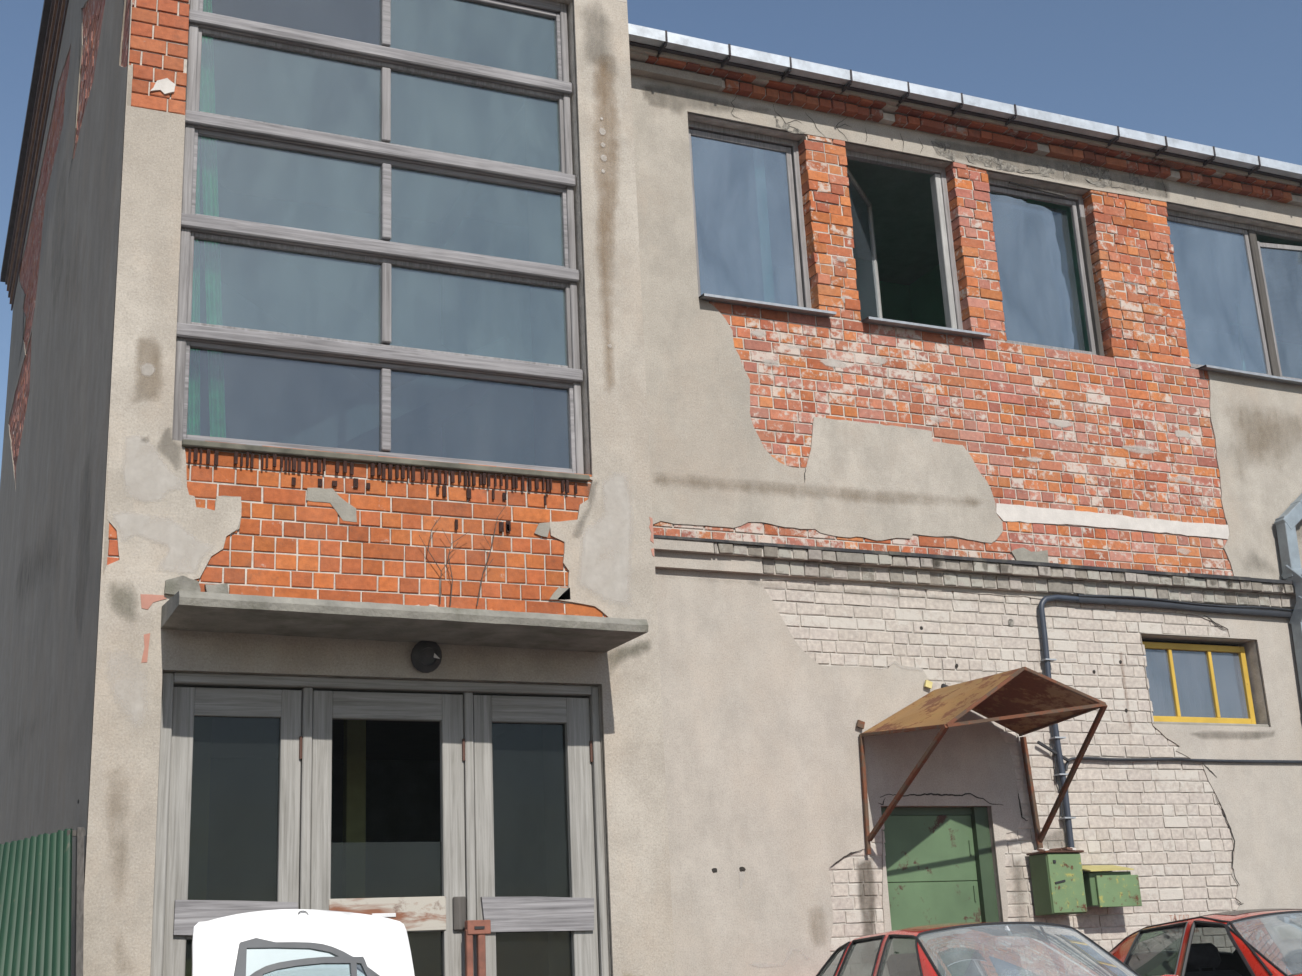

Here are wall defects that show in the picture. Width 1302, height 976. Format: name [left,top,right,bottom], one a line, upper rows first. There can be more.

flaking render [121,0,189,115]
flaking render [9,0,106,482]
flaking render [107,523,119,565]
flaking render [140,441,607,617]
flaking render [645,55,1302,976]
crack [1205,766,1245,935]